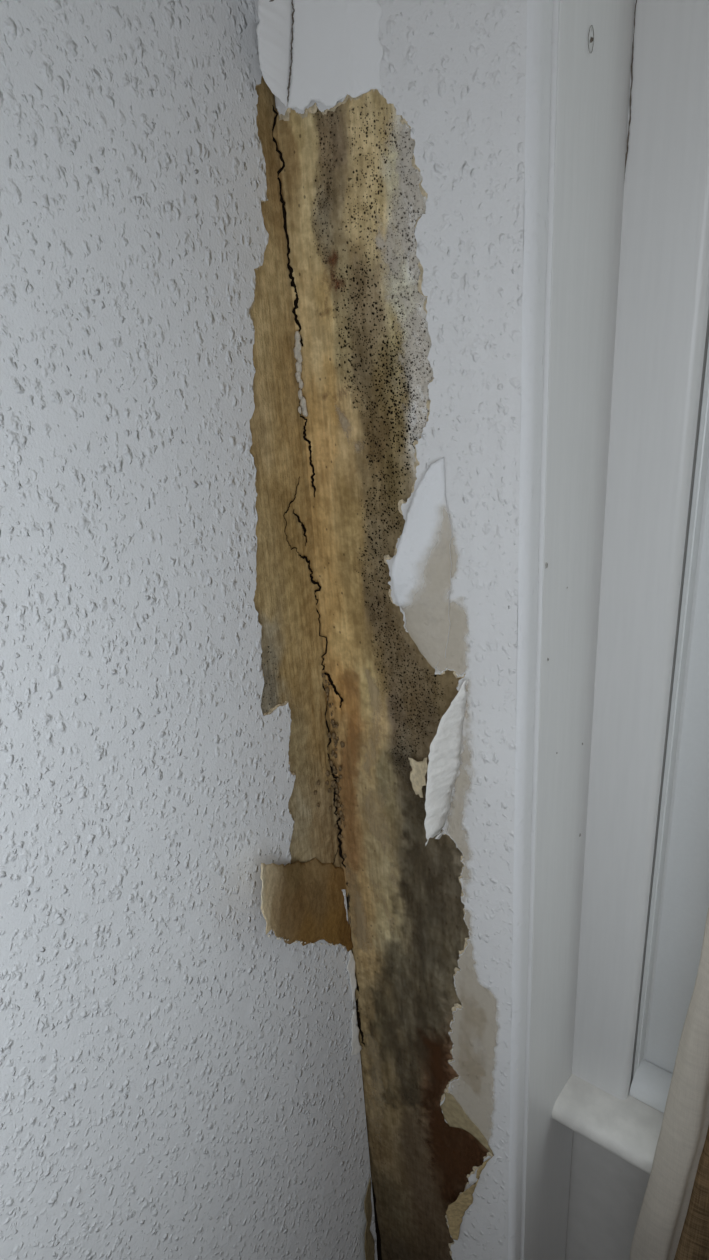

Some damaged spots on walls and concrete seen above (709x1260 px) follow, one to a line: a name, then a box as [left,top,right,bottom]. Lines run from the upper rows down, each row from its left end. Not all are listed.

crack [270,0,303,347]
leakage [312,99,468,821]
crack [283,402,365,1046]
leakage [369,751,497,1142]
crack [372,1185,382,1260]